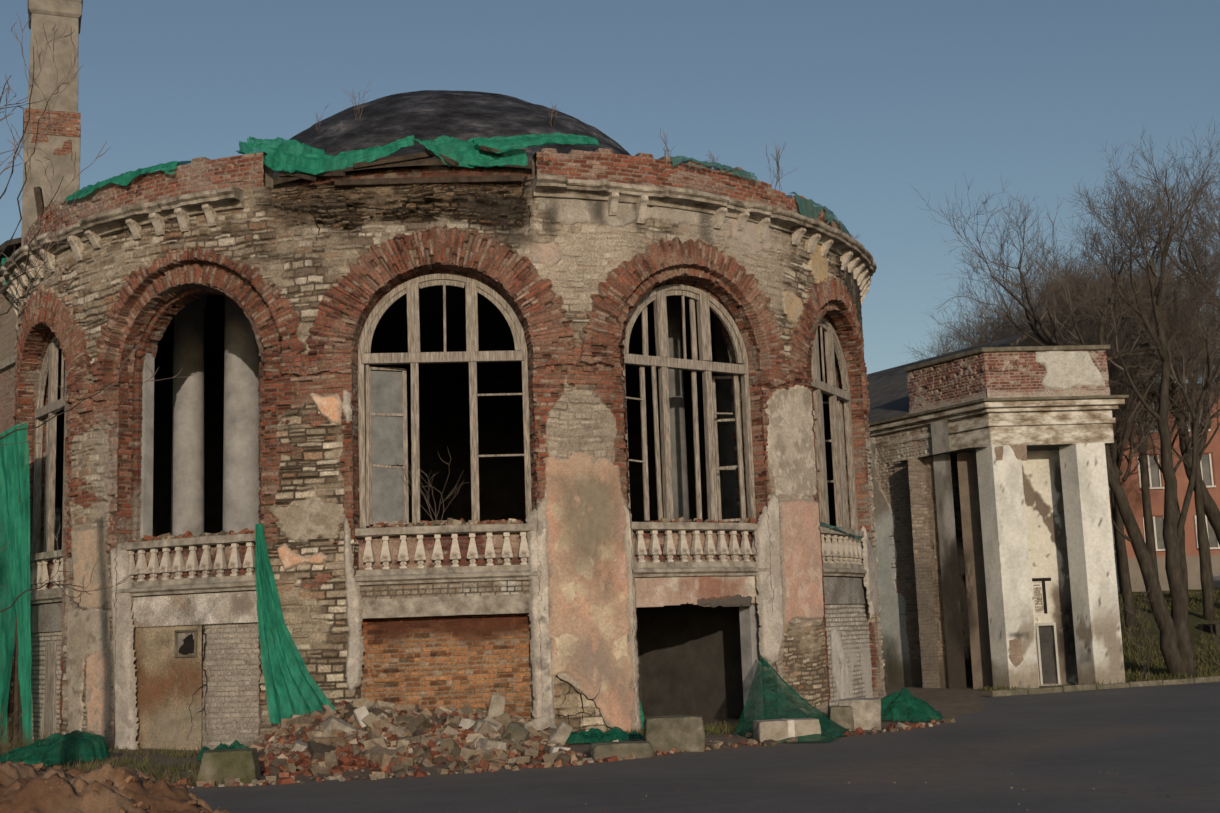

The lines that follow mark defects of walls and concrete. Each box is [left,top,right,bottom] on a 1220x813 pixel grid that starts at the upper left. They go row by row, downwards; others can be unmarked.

spalling [31,133,72,156]
peeling [1034,351,1106,390]
peeling [66,526,139,750]
peeling [269,499,365,694]
crack [556,675,611,733]
peeling [526,450,642,733]
peeling [697,385,831,708]